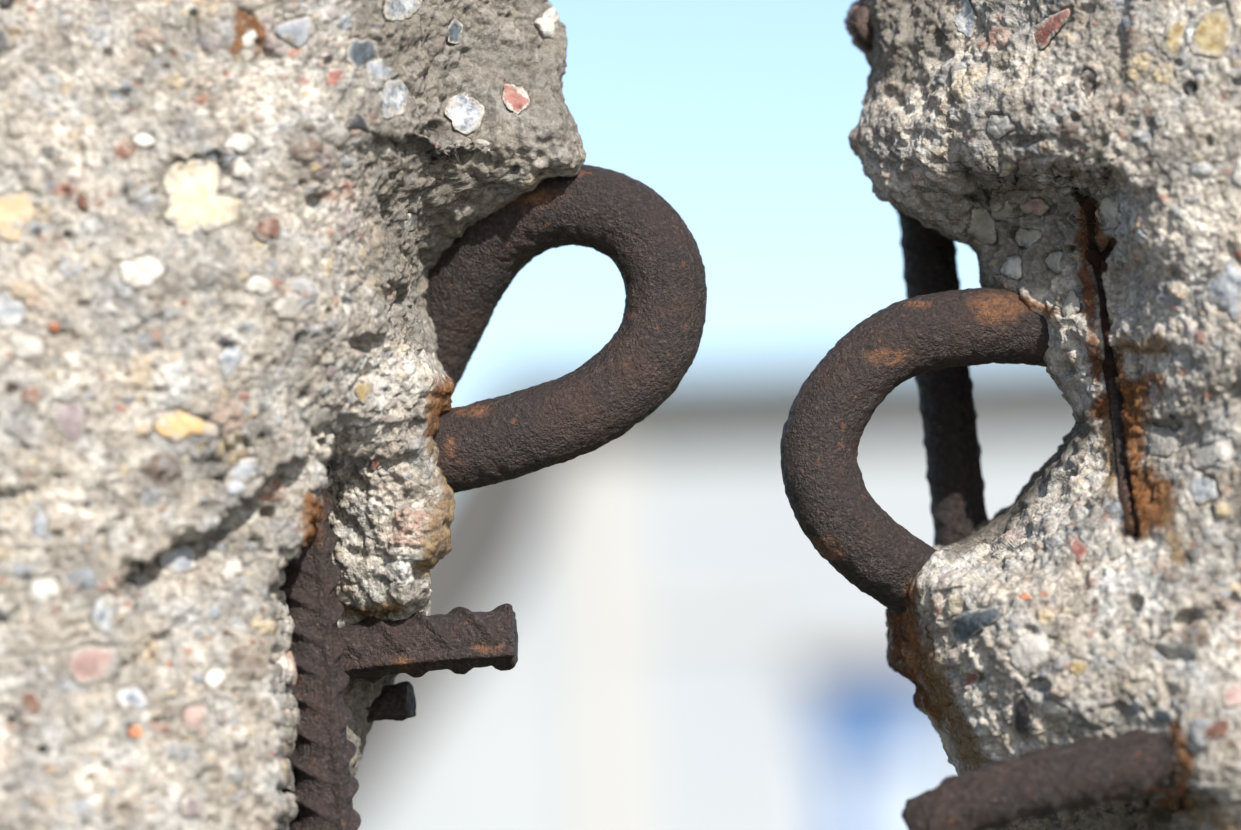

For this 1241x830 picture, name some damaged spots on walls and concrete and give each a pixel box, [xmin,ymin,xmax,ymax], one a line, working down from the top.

crack [1072,187,1138,537]
corrosion [1076,205,1185,563]
corrosion [886,583,982,770]
corrosion [1148,720,1238,830]